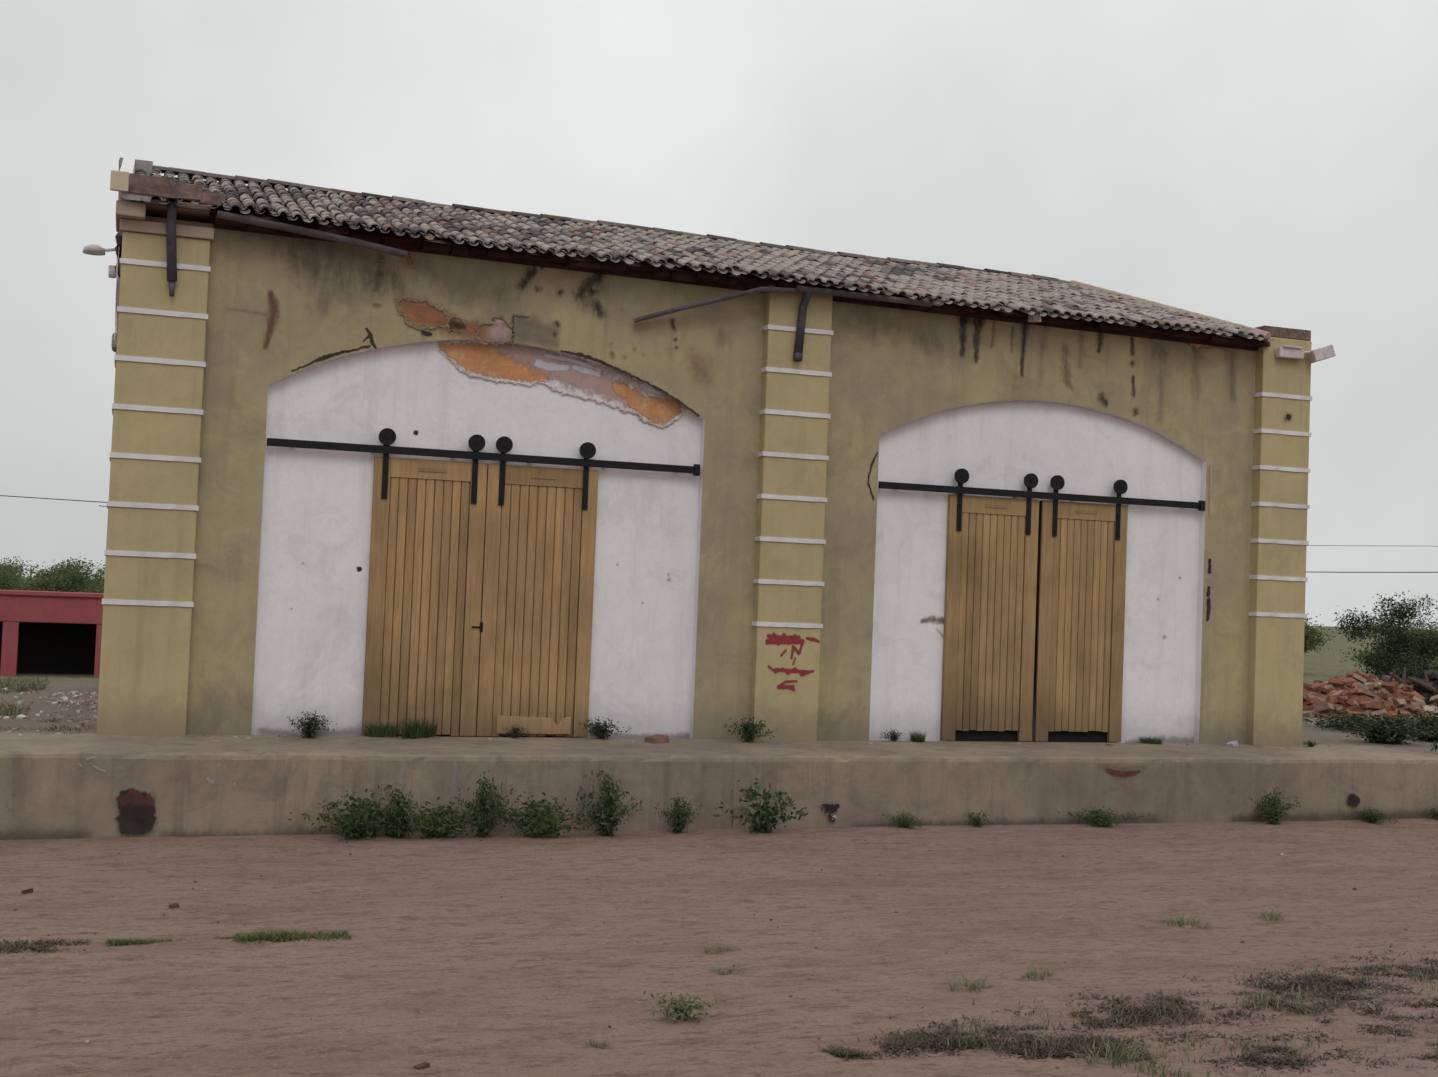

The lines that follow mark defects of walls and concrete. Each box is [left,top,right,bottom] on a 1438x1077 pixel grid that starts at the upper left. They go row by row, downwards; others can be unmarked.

crack [291,328,377,372]
peeling [396,296,685,429]
water stain [959,316,983,362]